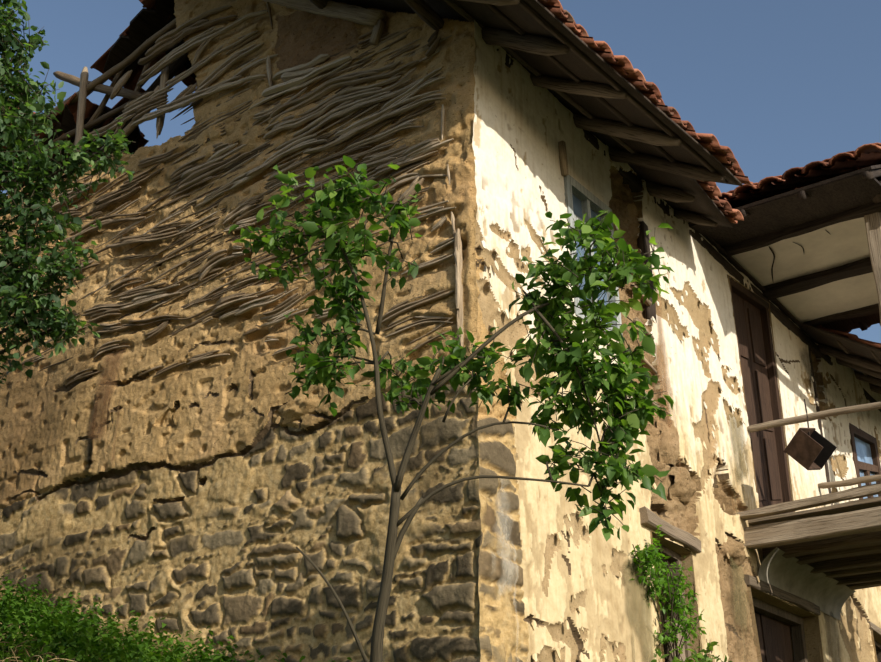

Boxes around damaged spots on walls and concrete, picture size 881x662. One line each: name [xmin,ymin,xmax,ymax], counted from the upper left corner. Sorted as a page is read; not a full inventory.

spalling [608,166,644,265]
flaking render [474,219,563,421]
crack [11,369,369,502]
spalling [619,273,748,539]
crack [127,527,157,541]
crack [153,496,185,504]
flaking render [541,508,591,597]
flaking render [602,546,627,579]
flaking render [528,589,589,662]
flaking render [599,633,626,662]